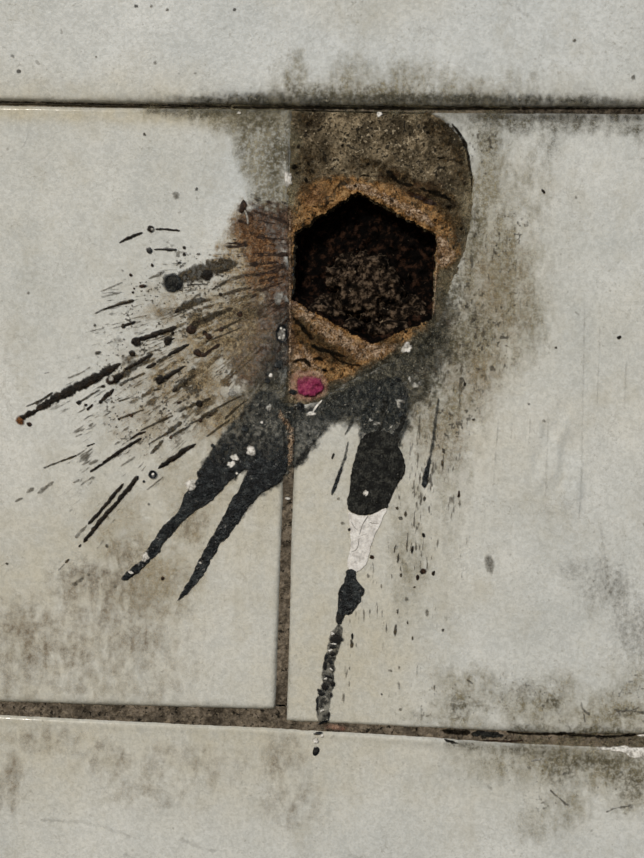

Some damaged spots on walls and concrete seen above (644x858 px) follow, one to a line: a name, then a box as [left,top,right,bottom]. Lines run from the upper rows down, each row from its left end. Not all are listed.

water stain [188,68,589,216]
water stain [391,113,597,588]
water stain [331,414,355,499]